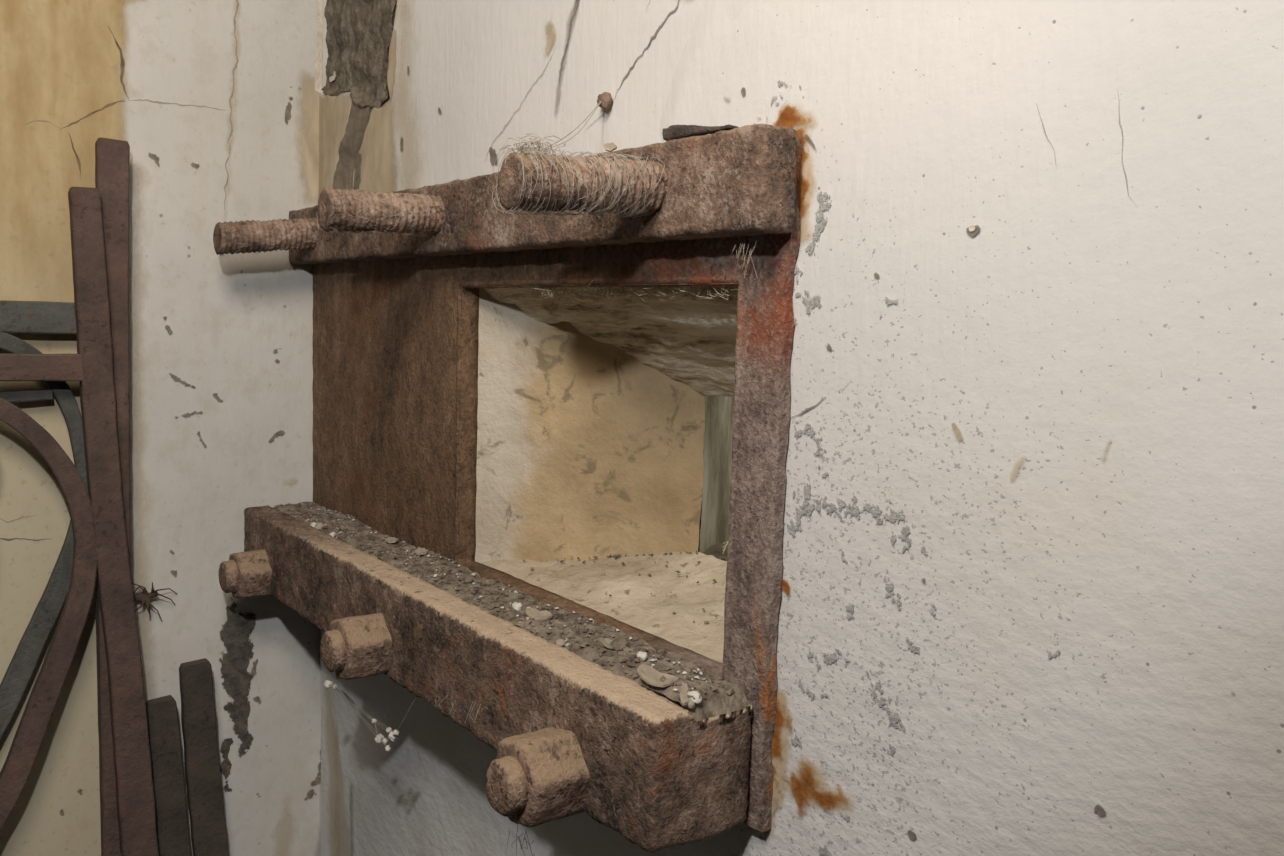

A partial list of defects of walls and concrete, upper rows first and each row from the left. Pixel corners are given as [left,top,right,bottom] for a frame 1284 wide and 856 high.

corrosion [771,691,843,815]